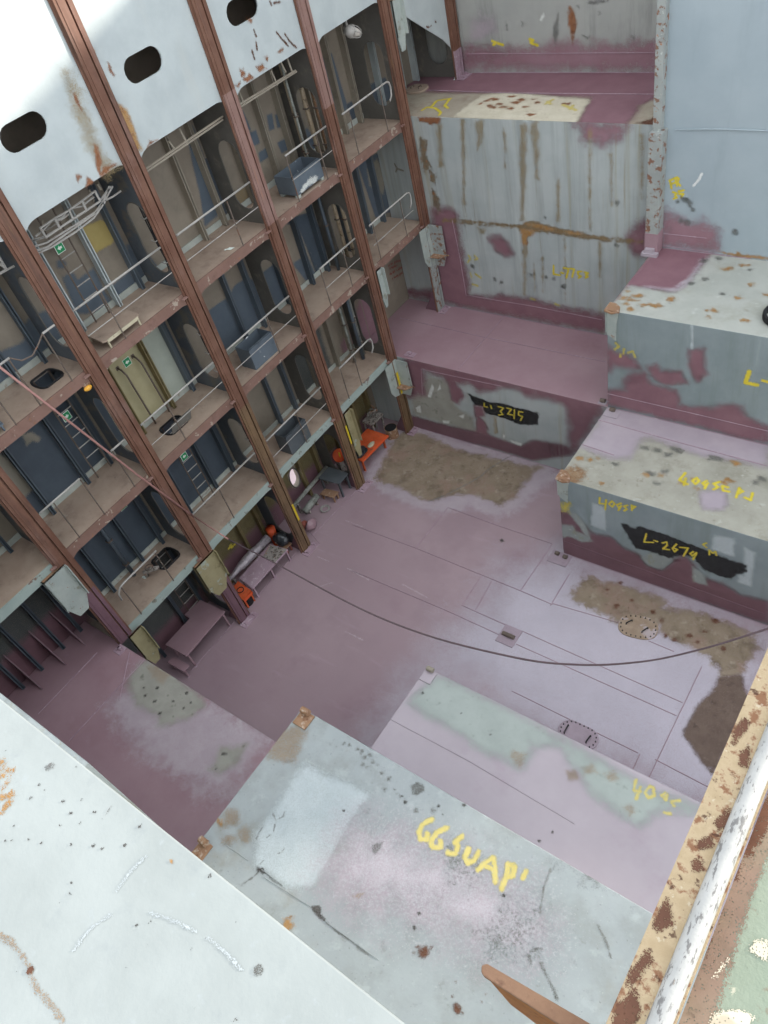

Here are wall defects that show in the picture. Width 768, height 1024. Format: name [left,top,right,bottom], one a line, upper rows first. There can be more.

rust [60,65,123,187]
rust [418,117,445,167]
rust [441,95,644,300]
peeling [410,374,477,433]
peeling [562,503,607,543]
peeling [641,551,672,569]
peeling [691,566,709,586]
peeling [710,535,757,587]
rust [729,717,751,768]
rust [690,808,732,872]
rust [652,896,676,934]
rust [611,949,655,1024]